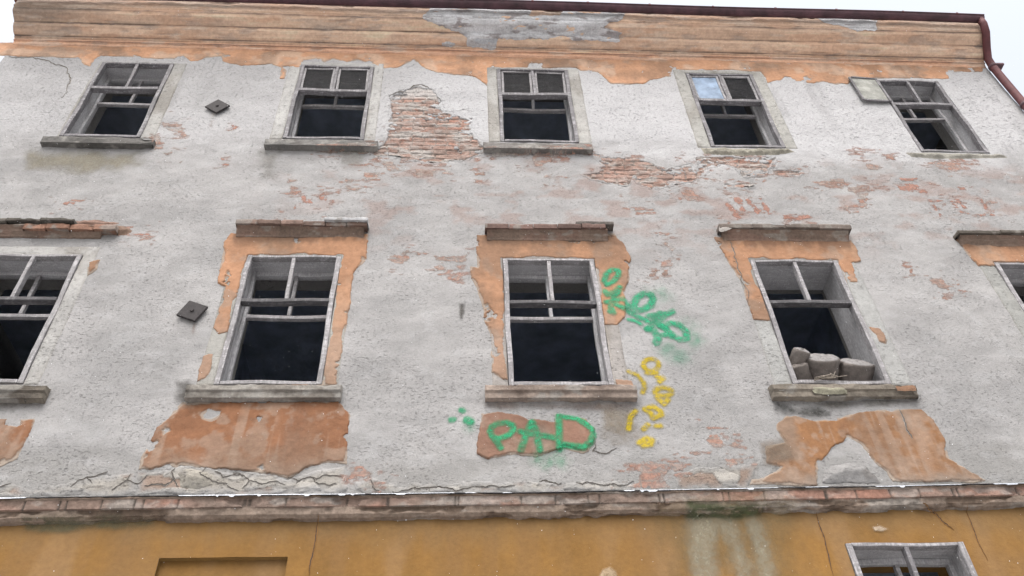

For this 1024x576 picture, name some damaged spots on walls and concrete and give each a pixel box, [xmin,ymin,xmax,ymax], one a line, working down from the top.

crack [9,56,71,98]
peeling [0,8,983,86]
flaking render [280,84,997,224]
peeling [213,233,368,386]
peeling [388,233,631,380]
peeling [714,236,861,321]
crack [71,467,343,491]
crack [371,480,513,493]
peeling [0,401,985,497]
crack [539,479,632,487]
crack [816,512,833,574]
crack [923,503,988,561]